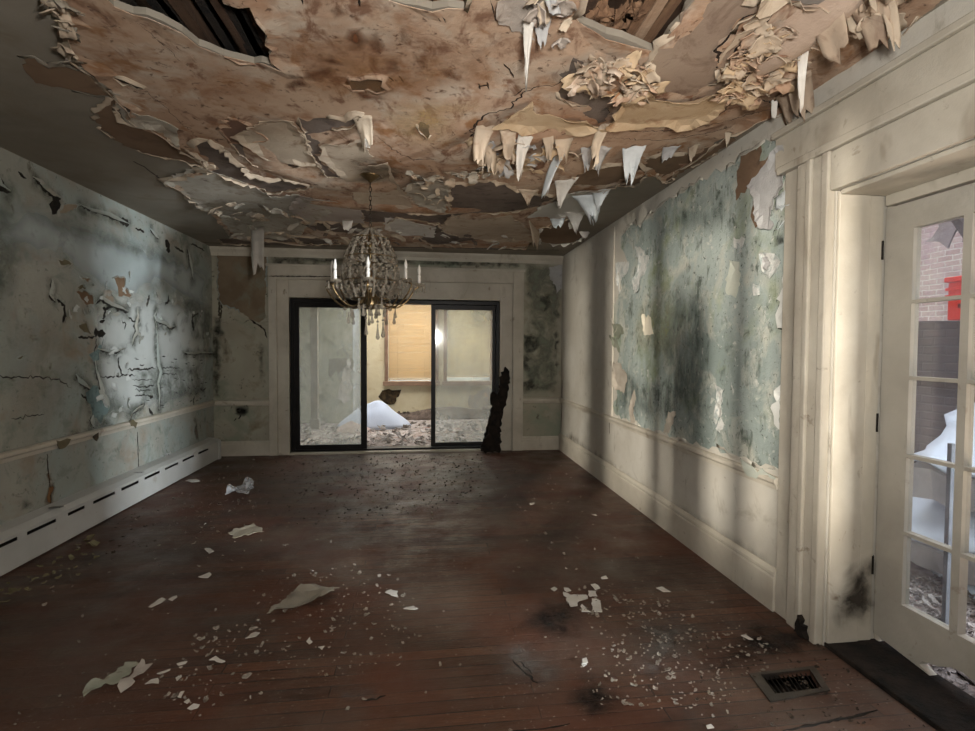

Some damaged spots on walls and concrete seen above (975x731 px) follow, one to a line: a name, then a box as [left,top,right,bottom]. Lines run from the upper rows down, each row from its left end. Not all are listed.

flaking render [18,0,941,330]
crack [0,171,227,283]
peeling [57,271,143,336]
crack [0,277,223,467]
peeling [609,324,636,423]
peeling [641,314,653,335]
peeling [714,384,724,432]
spalling [770,385,781,429]